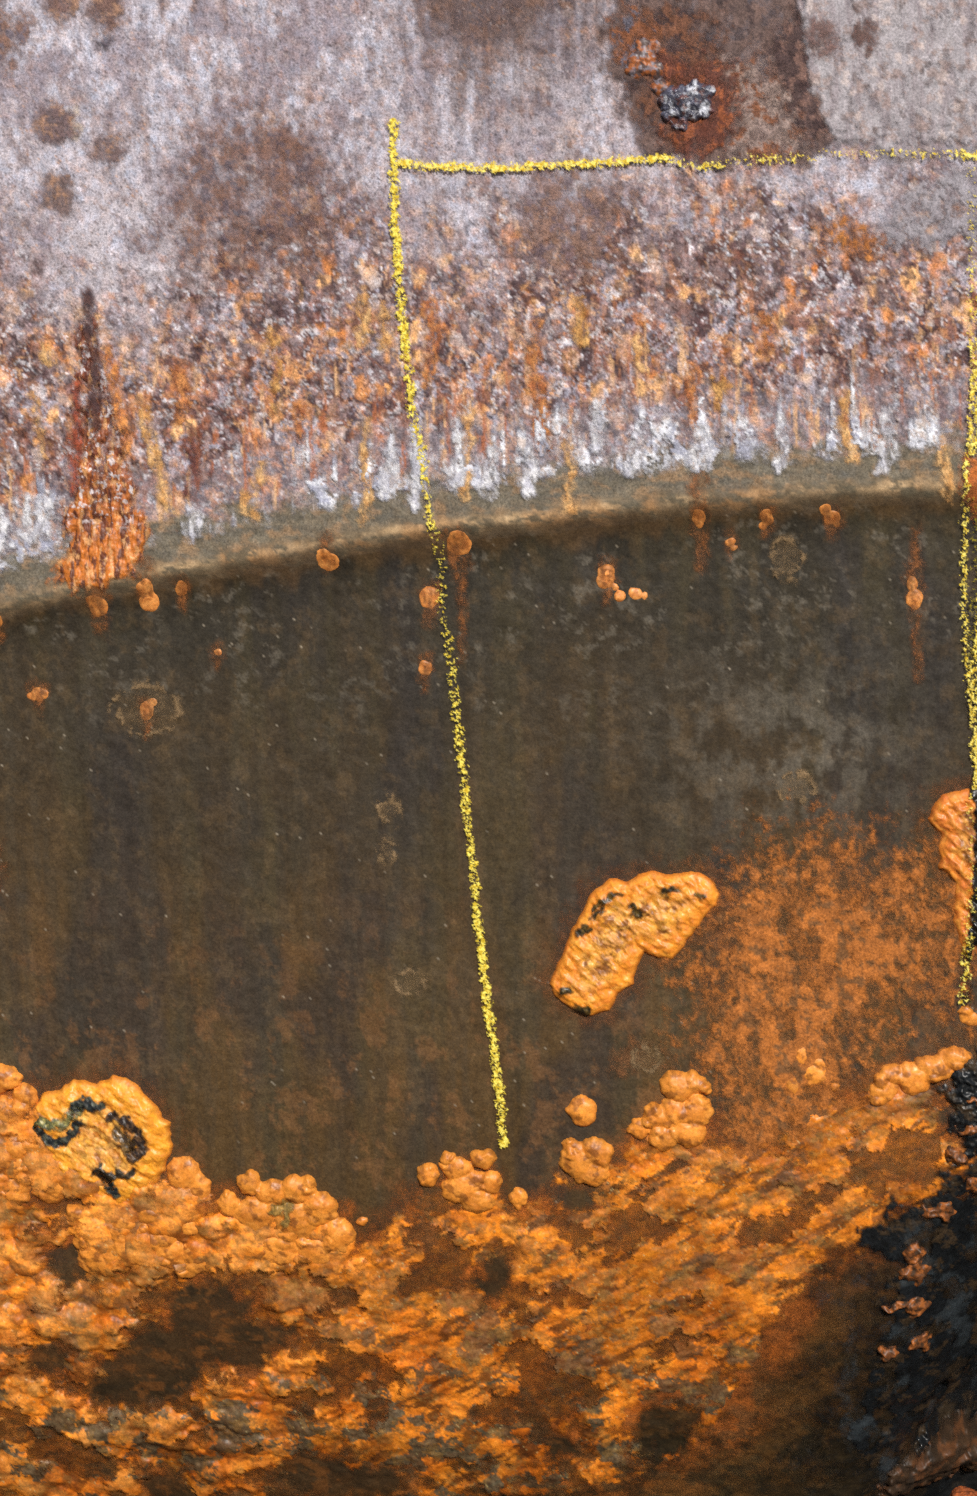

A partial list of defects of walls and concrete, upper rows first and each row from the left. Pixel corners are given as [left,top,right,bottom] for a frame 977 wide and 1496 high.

rust [625,37,748,159]
rust [43,173,74,215]
rust [158,98,344,276]
damp [0,473,61,571]
rust [55,287,213,593]
damp [183,505,203,541]
damp [297,397,789,569]
rust [525,320,577,513]
rust [836,390,898,470]
damp [813,372,952,474]
rust [938,423,977,512]
rust [0,808,977,1496]